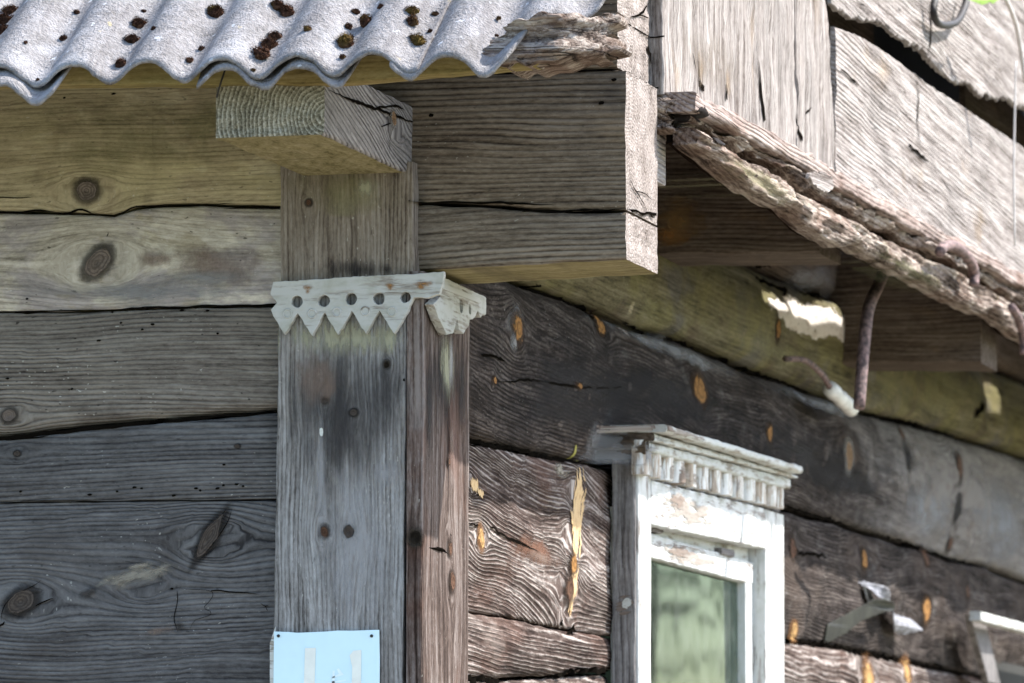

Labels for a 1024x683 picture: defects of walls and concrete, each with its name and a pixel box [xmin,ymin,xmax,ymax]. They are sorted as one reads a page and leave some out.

crack [0,197,279,236]
crack [418,180,657,218]
crack [482,354,622,389]
damp [294,368,391,501]
peeling [651,461,714,526]
crack [470,521,539,552]
peeling [663,544,716,565]